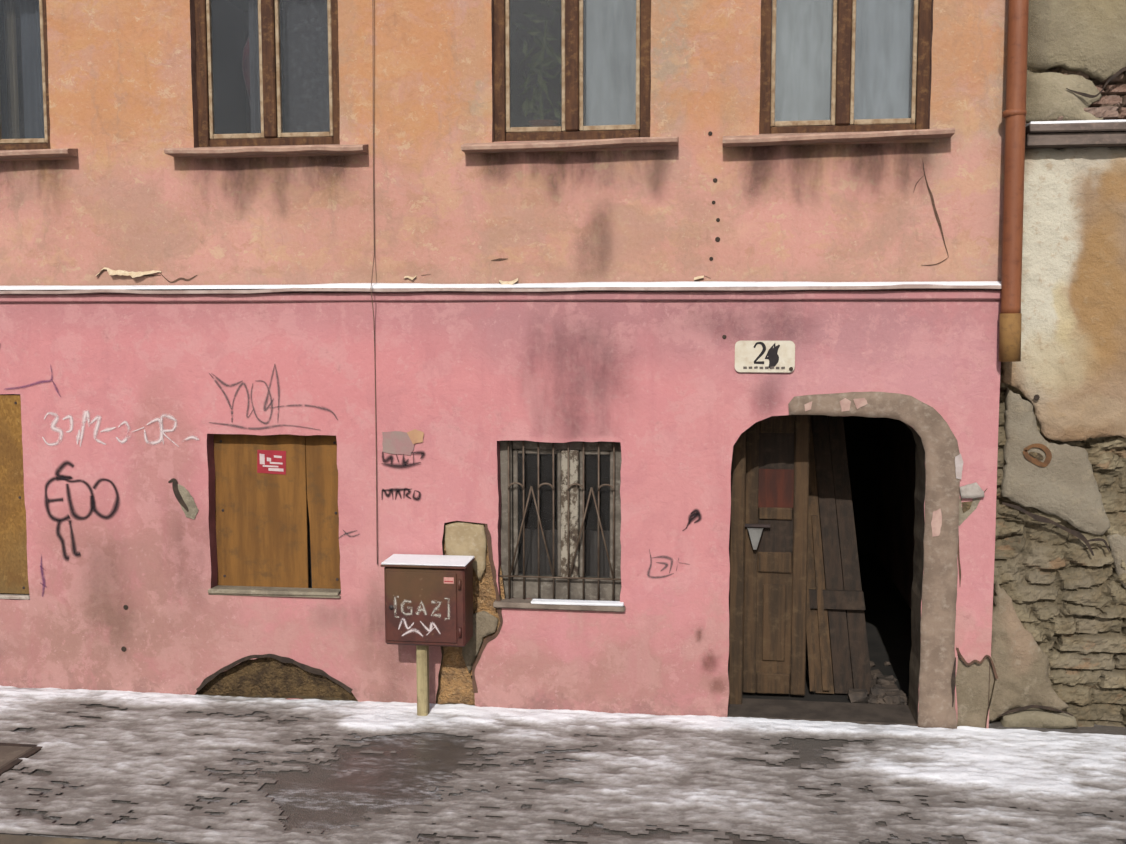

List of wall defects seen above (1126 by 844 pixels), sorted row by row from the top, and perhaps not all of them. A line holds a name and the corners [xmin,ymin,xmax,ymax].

crack [913,159,949,266]
peeling [840,398,868,412]
peeling [931,509,942,537]
flaking render [955,454,987,584]
spalling [437,521,505,705]
spalling [196,654,357,701]